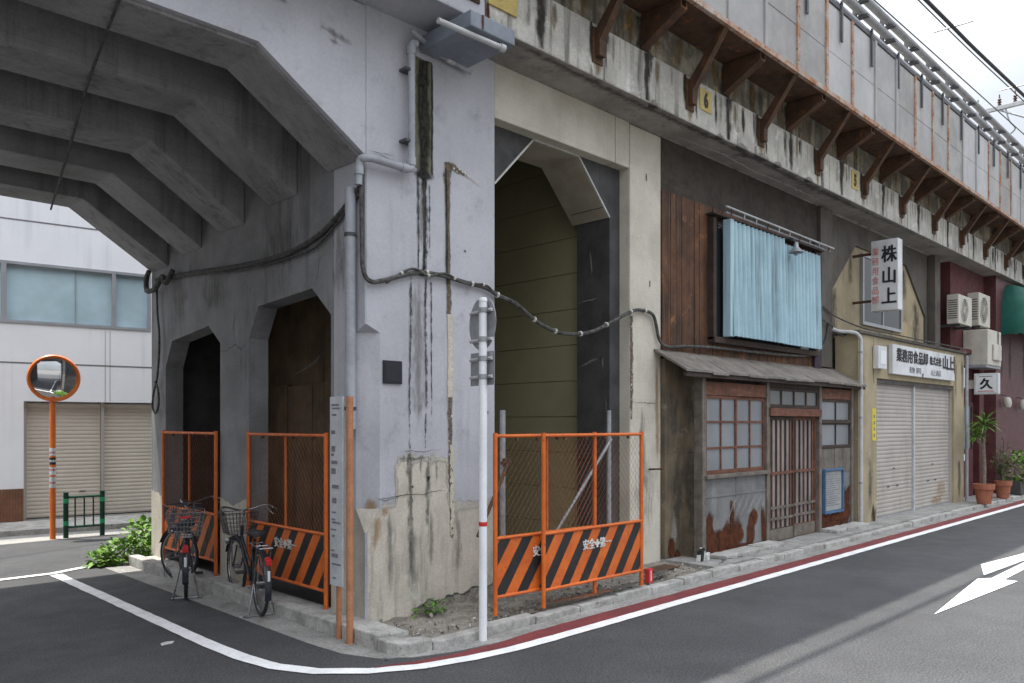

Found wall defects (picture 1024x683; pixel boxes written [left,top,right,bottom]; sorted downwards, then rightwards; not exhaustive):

water stain [530,0,905,223]
peeling [331,162,493,622]
water stain [401,56,437,576]
rust [706,501,766,554]
rust [822,486,850,528]